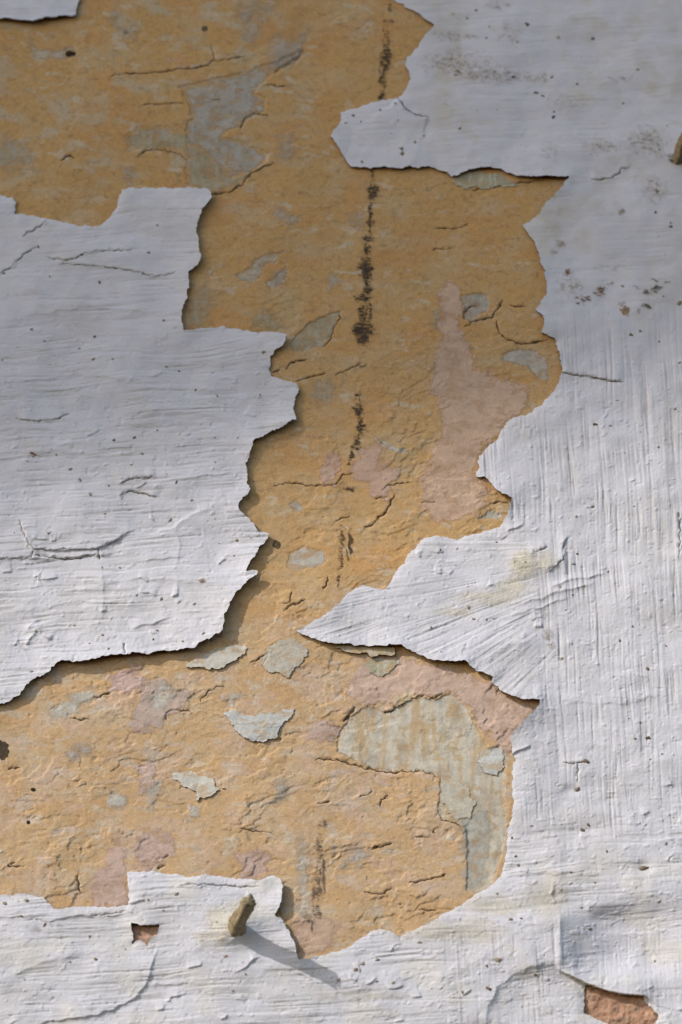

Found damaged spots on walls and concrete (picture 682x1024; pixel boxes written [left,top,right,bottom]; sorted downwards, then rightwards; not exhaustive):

crack [110,50,240,77]
crack [266,51,303,87]
peeling [0,0,569,959]
crack [337,482,422,528]
crack [4,520,126,560]
spalling [584,985,682,1024]